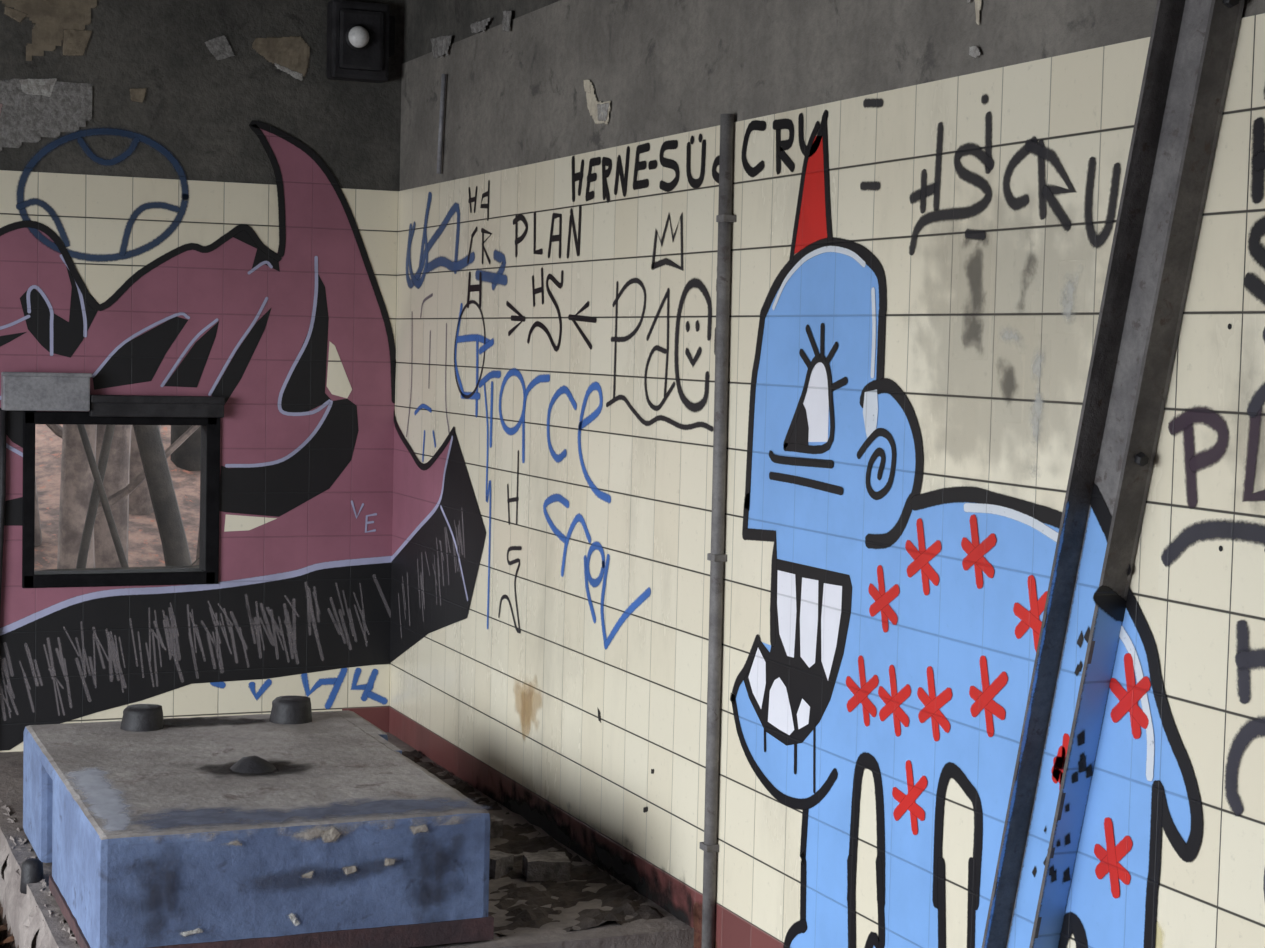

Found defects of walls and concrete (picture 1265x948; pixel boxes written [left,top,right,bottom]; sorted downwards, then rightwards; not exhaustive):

peeling [0,0,97,61]
peeling [0,78,92,152]
spalling [71,768,129,830]
spalling [0,800,77,948]